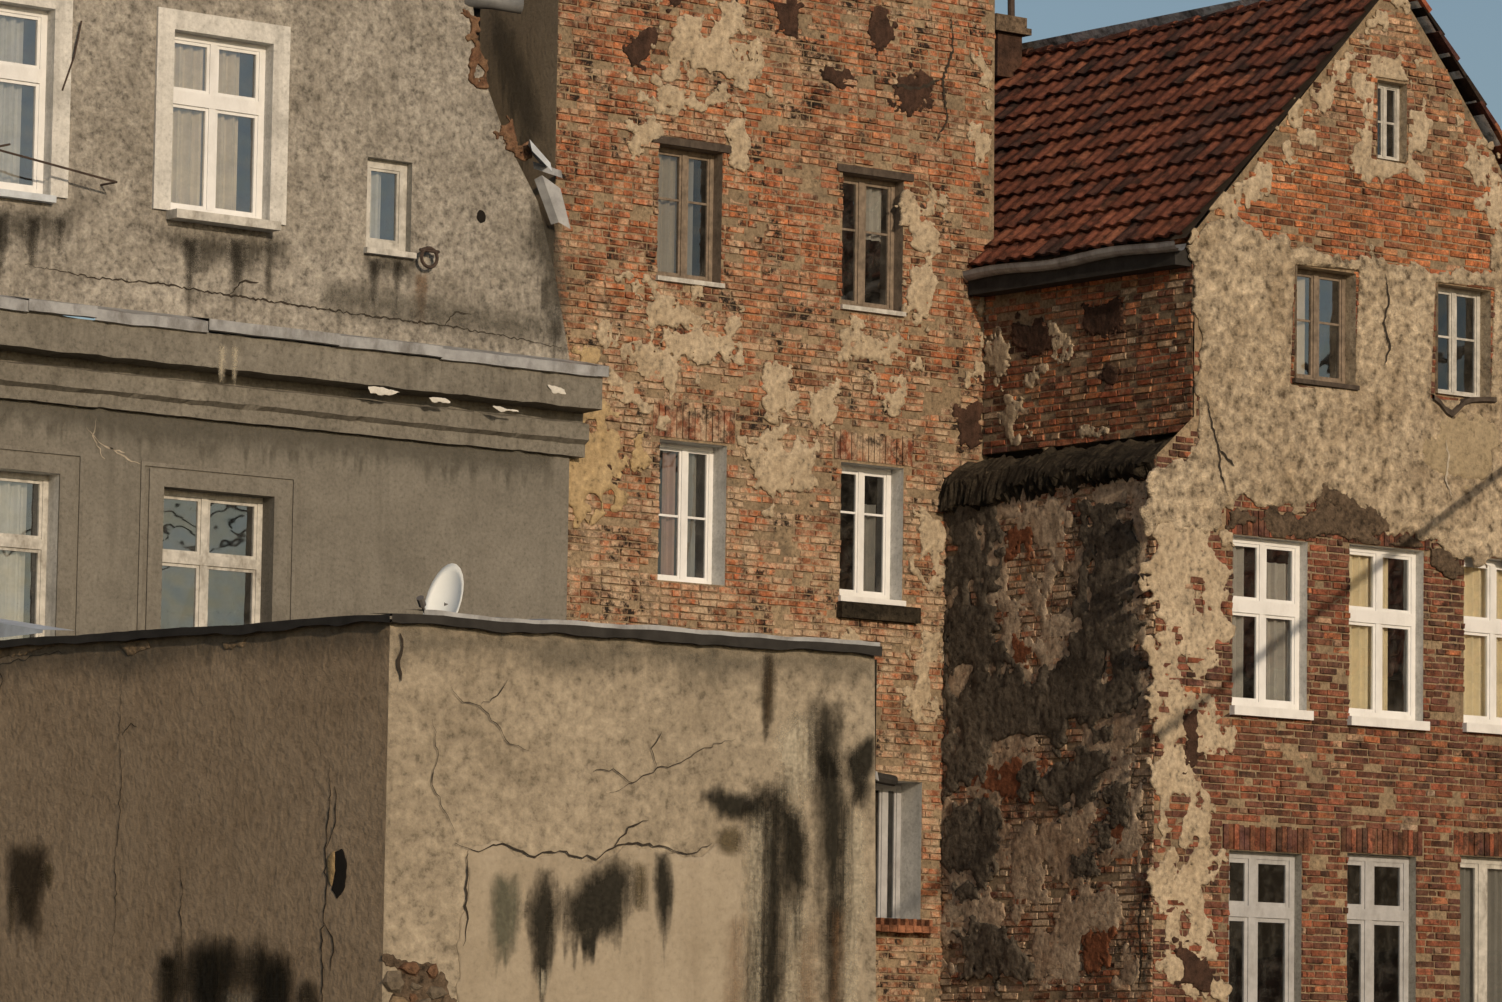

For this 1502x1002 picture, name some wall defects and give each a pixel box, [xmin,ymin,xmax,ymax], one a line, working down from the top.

peeling [1272,0,1411,177]
spalling [952,296,1128,453]
leakage [9,847,52,930]
crack [320,764,337,1001]
spalling [381,953,457,1002]
crack [432,683,712,946]
leakage [494,854,673,999]
crack [593,732,735,793]
leakage [763,655,774,737]
leakage [705,703,875,1002]
flaking render [908,498,1149,996]
spalling [1172,936,1213,992]